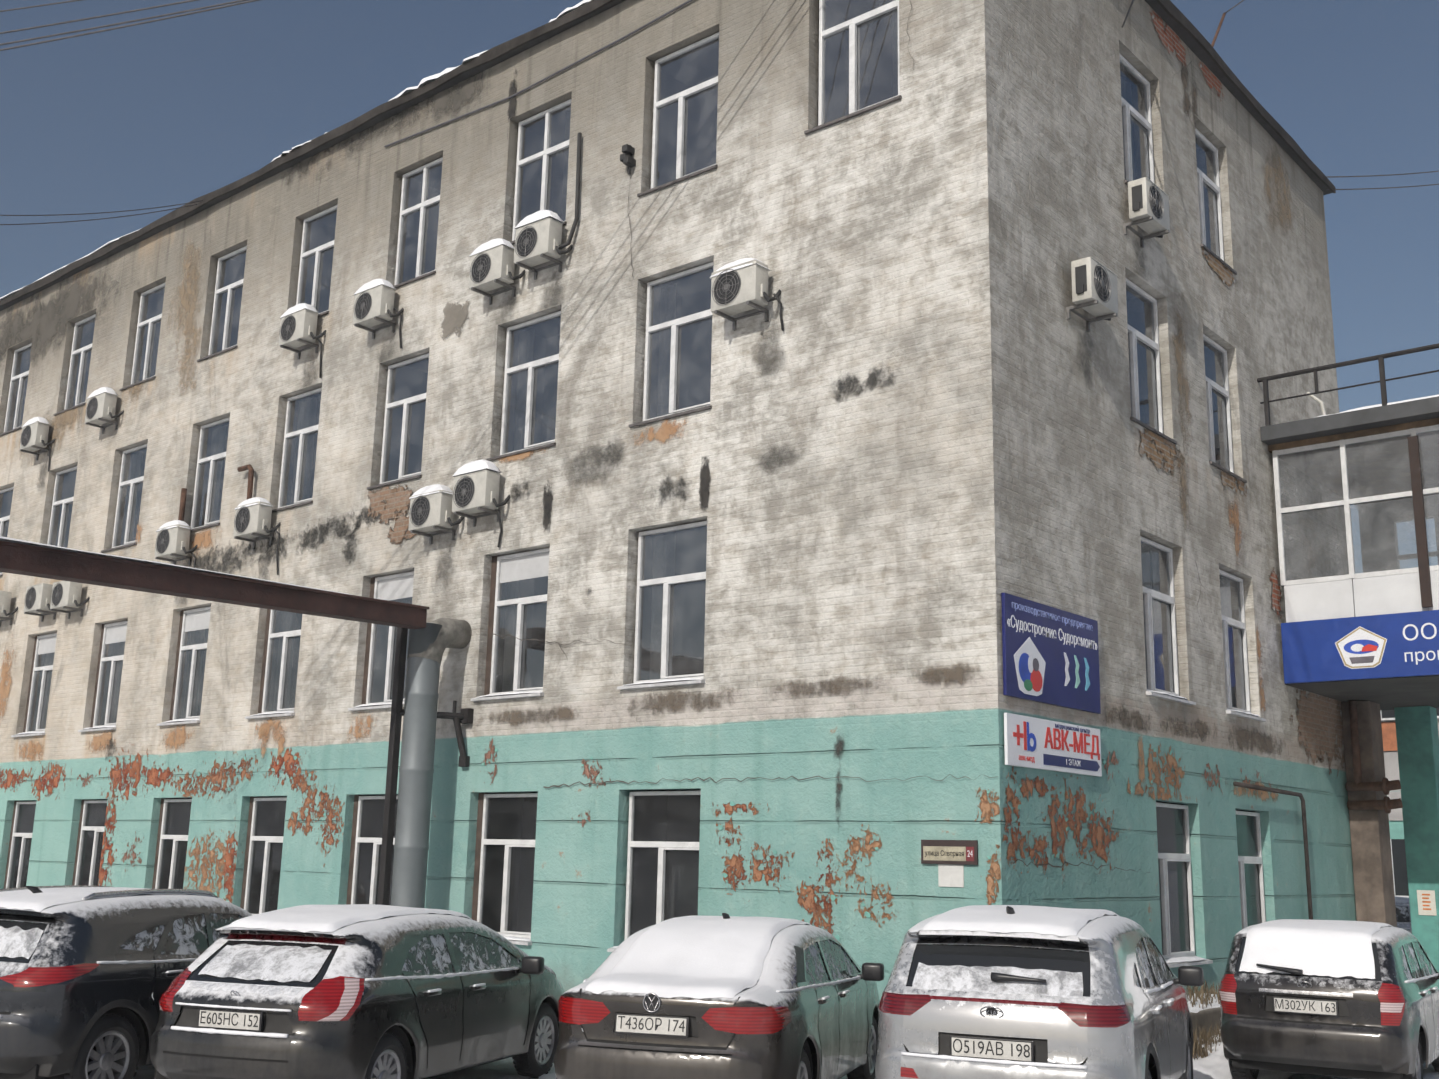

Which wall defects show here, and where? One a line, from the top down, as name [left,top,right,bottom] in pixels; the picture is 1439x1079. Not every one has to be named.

flaking render [1149,9,1224,101]
leakage [834,368,893,401]
spalling [1137,429,1185,477]
leakage [186,507,380,574]
spalling [367,485,417,547]
peeling [0,743,345,886]
peeling [184,819,238,903]
peeling [712,801,899,944]
peeling [974,766,1119,905]
peeling [1127,744,1197,802]